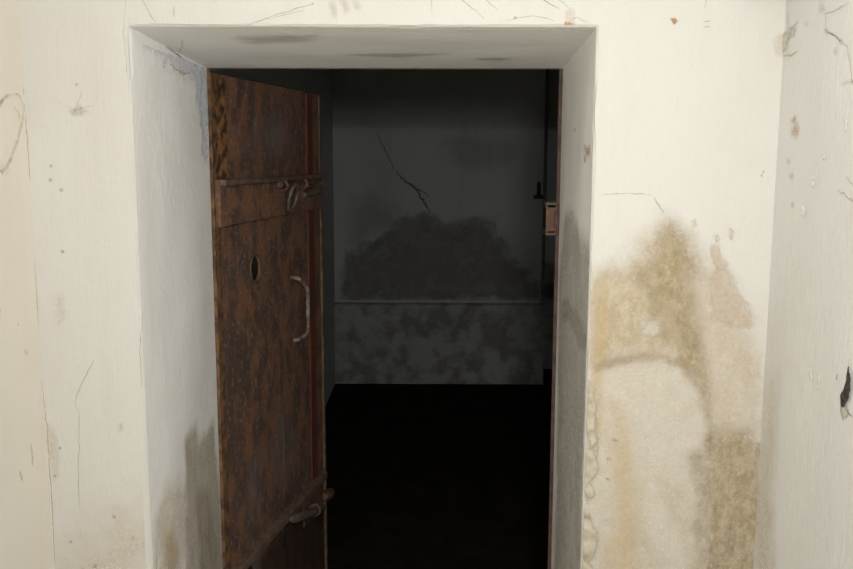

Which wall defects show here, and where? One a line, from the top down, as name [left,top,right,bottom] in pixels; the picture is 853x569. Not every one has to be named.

crack [377,133,431,213]
leakage [600,240,706,397]
leakage [710,235,751,327]
spalling [836,366,852,421]
leakage [186,428,222,569]
leakage [706,433,760,569]